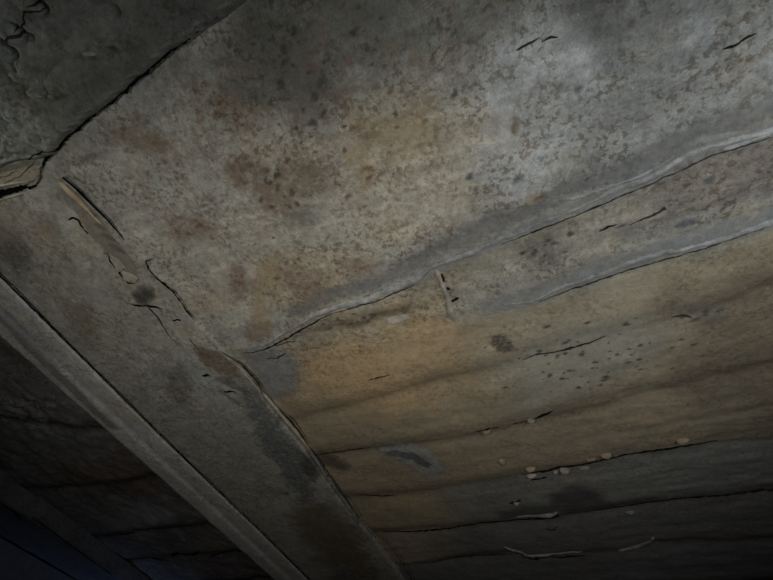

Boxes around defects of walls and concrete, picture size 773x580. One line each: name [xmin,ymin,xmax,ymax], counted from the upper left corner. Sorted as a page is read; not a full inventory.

crack [24,16,219,190]
peeling [0,161,36,201]
crack [104,253,365,456]
crack [523,336,605,360]
damp [485,318,662,417]
crack [0,275,309,580]
crack [476,411,553,432]
crack [522,440,718,481]
crack [382,488,773,580]